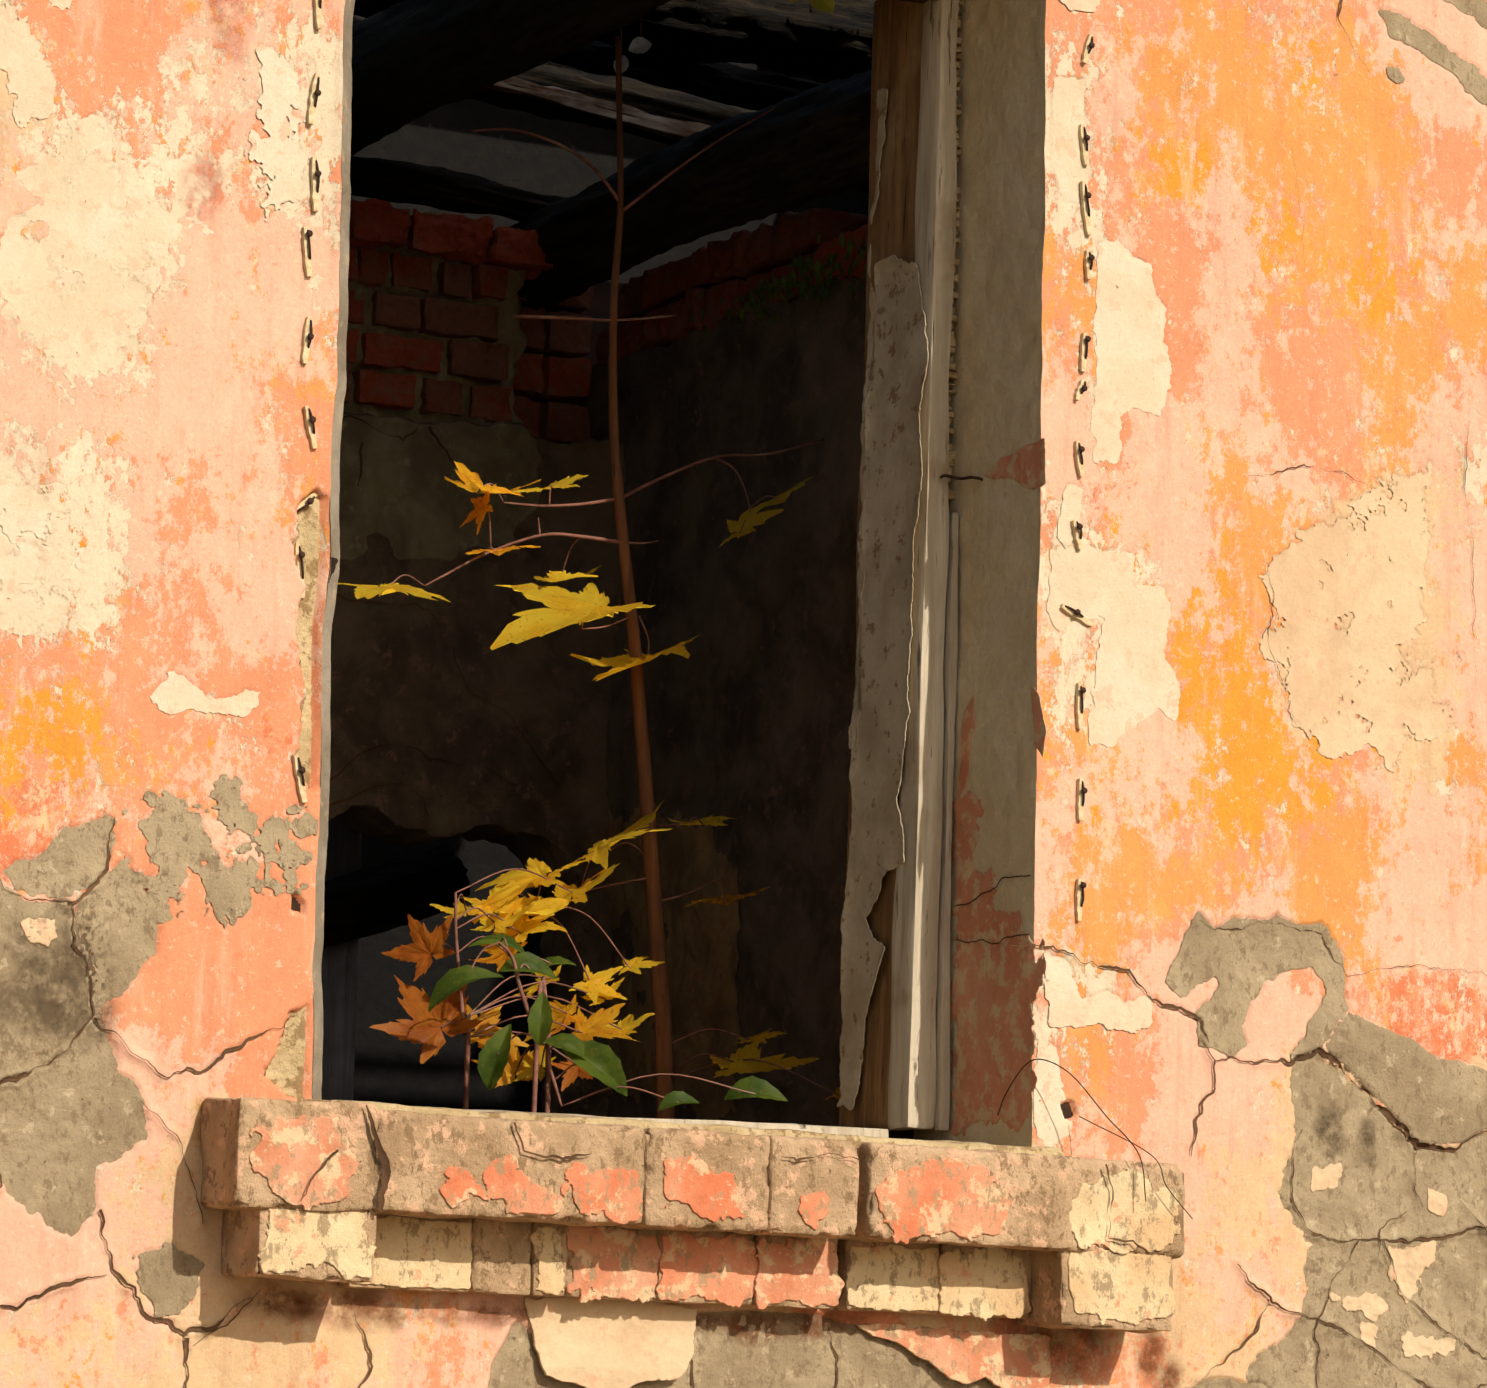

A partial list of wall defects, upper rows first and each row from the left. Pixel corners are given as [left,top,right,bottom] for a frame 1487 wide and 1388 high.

crack [1338,0,1370,73]
peeling [1090,240,1172,464]
crack [0,1209,261,1388]
crack [0,817,293,1223]
flaking render [0,414,542,1237]
crack [354,1311,373,1388]
spalling [249,1006,1051,1388]
peeling [837,244,929,1110]
peeling [950,684,1153,1147]
peeling [1067,1168,1181,1326]
crack [955,875,1487,1388]
spalling [1166,911,1487,1388]